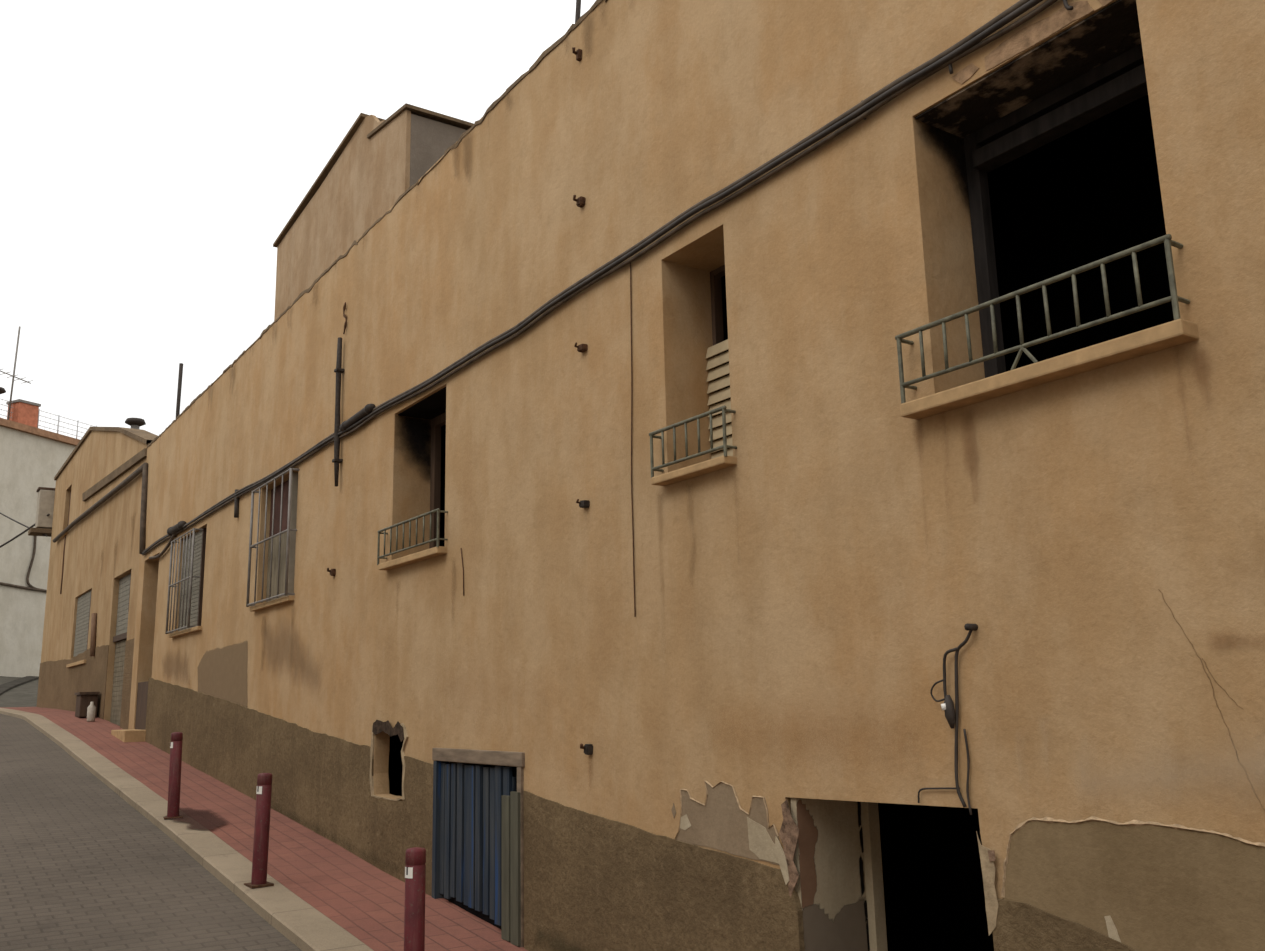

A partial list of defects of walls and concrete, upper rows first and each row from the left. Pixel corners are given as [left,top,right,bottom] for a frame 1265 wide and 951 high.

crack [1159,590,1265,810]
flaking render [672,781,868,951]
flaking render [976,816,1265,951]